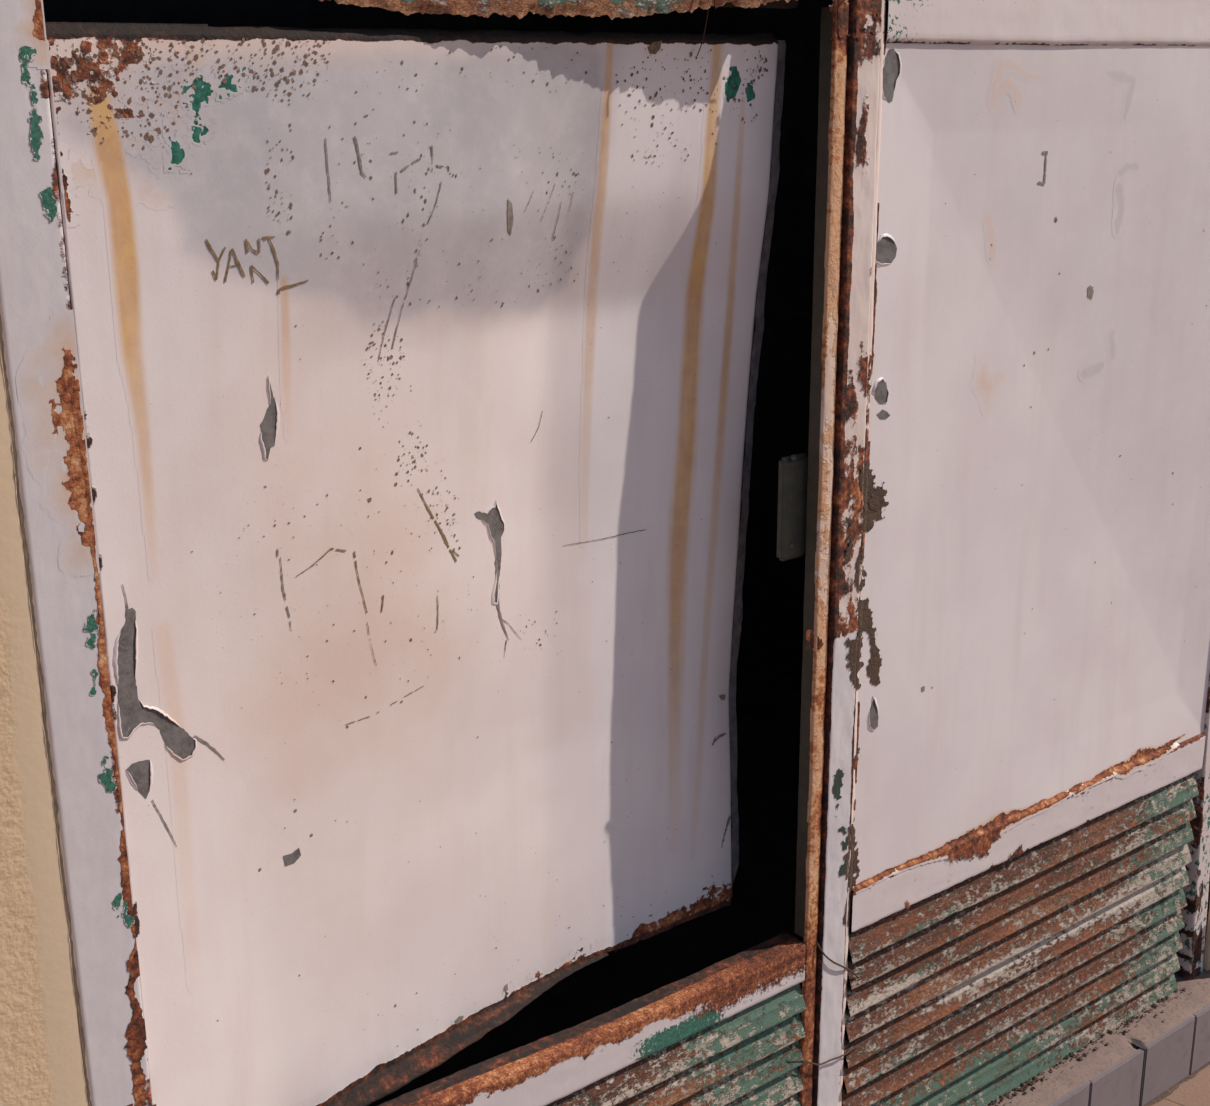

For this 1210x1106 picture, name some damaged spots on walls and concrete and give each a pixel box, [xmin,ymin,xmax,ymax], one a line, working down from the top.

peeling [882,48,902,103]
corrosion [9,0,330,582]
peeling [875,233,897,267]
peeling [259,375,280,461]
corrosion [521,33,768,861]
peeling [872,377,890,419]
peeling [475,500,522,656]
corrosion [844,460,889,690]
corrosion [15,310,148,1106]
peeling [113,584,225,762]
corrosion [626,870,733,944]
corrosion [843,732,1186,927]